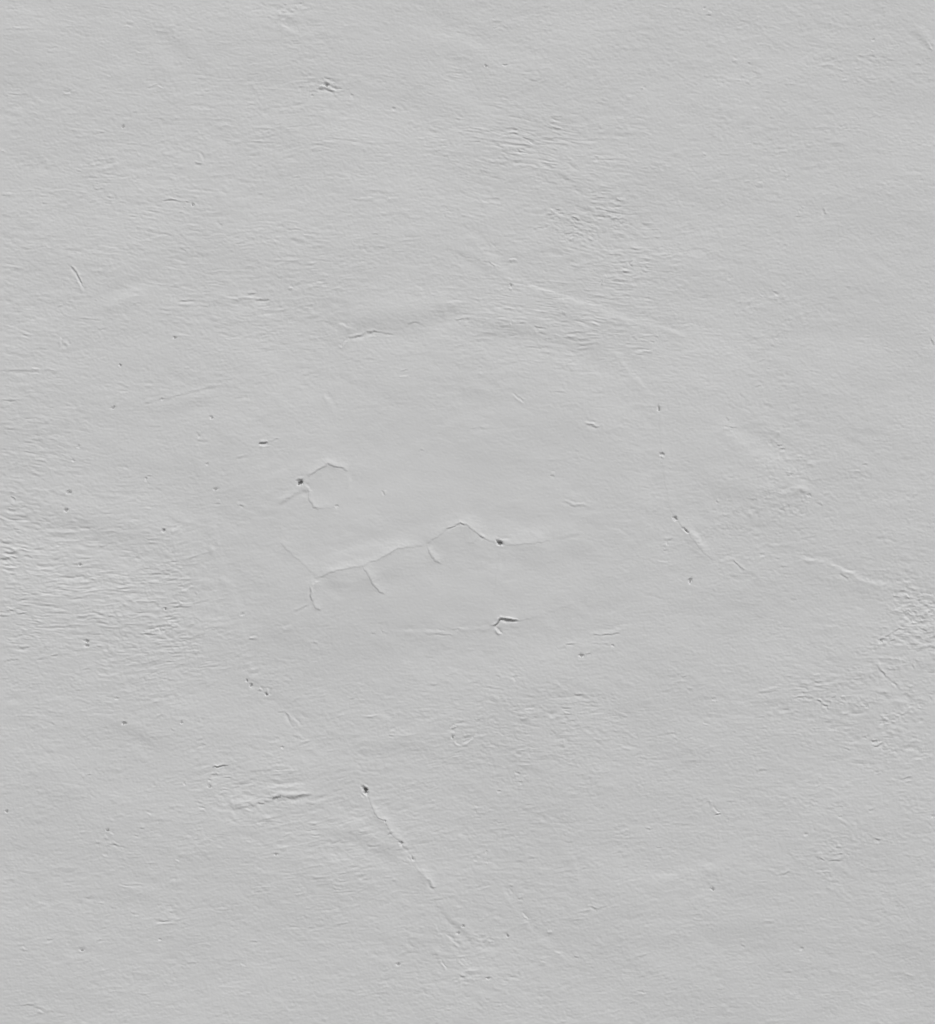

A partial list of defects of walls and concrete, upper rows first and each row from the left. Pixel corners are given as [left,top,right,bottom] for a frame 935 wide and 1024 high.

crack [275,521,586,638]
crack [361,785,439,895]